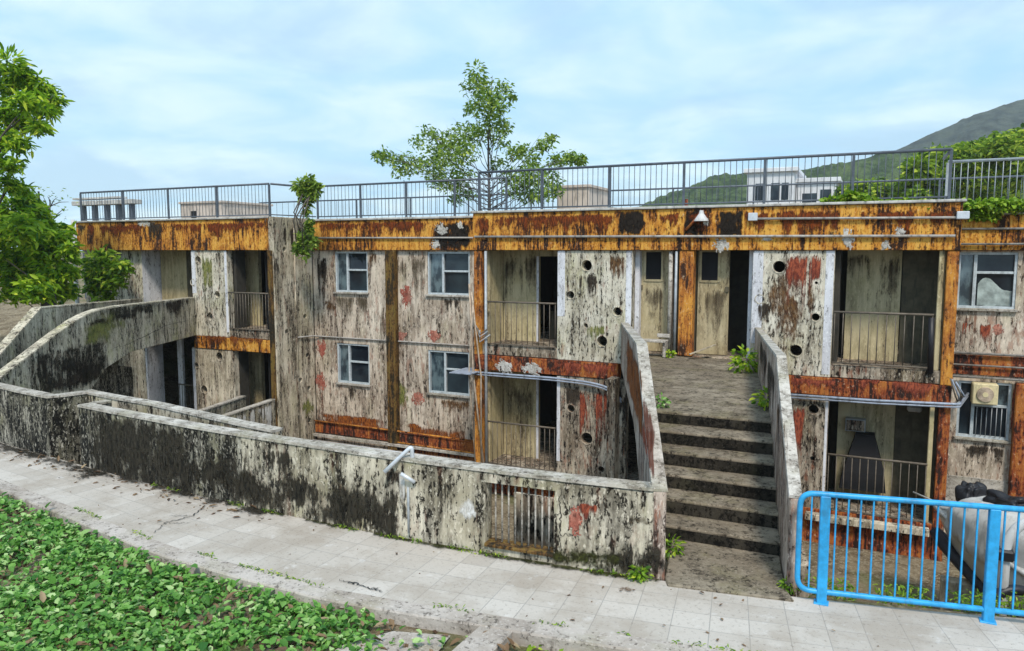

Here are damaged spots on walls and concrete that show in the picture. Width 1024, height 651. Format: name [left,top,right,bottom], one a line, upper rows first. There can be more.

rust [168,222,264,242]
rust [319,221,426,241]
peeling [431,221,464,250]
rust [479,214,617,239]
rust [652,212,708,233]
rust [744,210,953,241]
damp [579,274,597,295]
damp [88,300,188,326]
damp [32,340,108,393]
damp [237,406,272,425]
damp [89,413,411,537]
peeling [569,505,583,536]